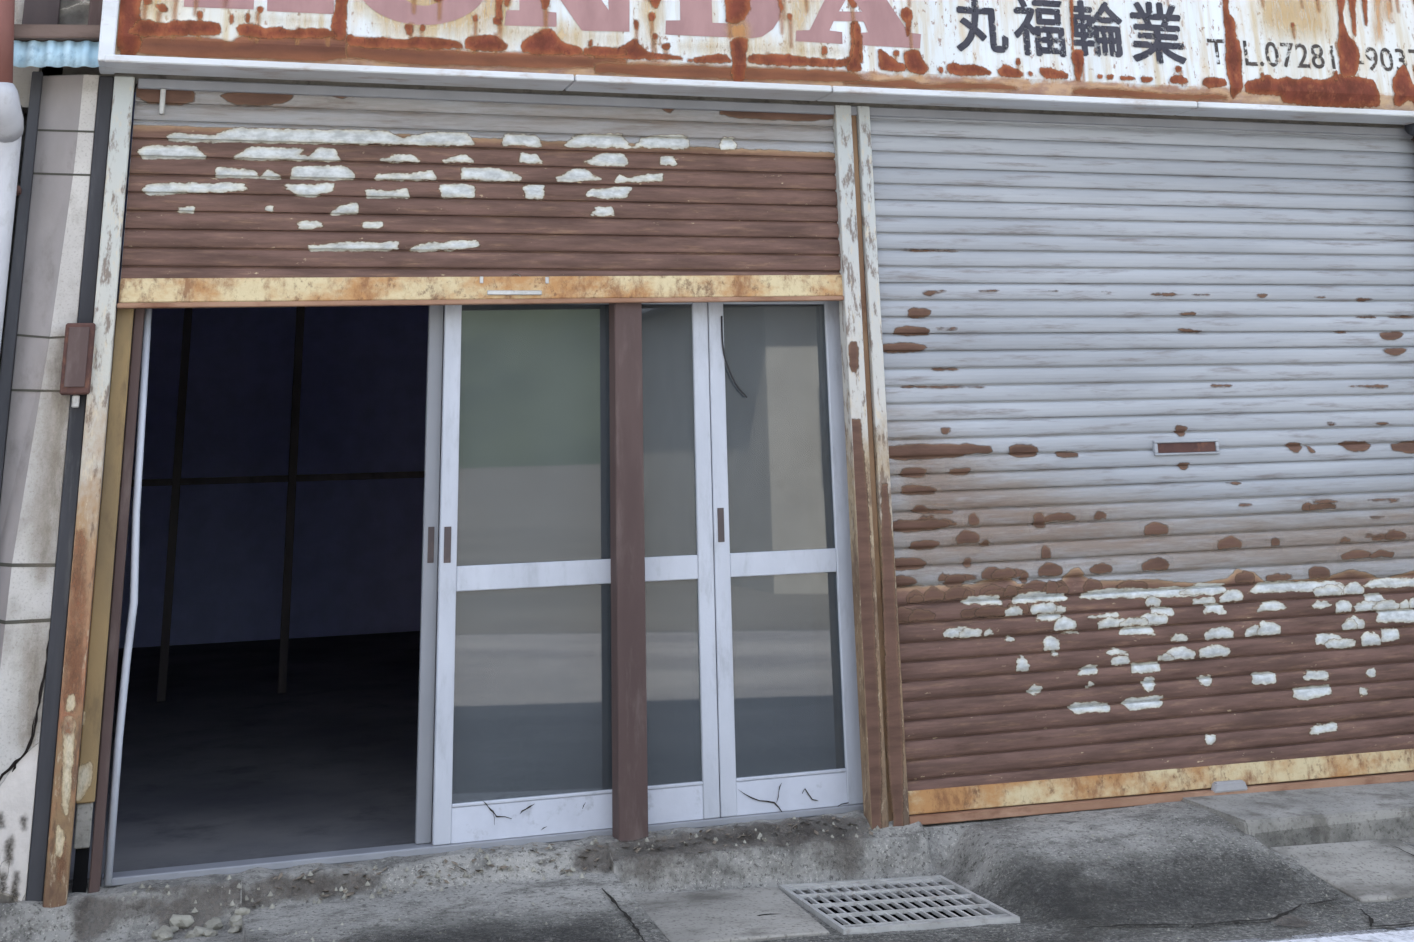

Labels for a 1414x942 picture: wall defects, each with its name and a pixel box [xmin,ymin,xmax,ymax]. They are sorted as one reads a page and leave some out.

corrosion [117,0,1414,109]
corrosion [719,111,833,121]
corrosion [121,122,841,278]
corrosion [848,341,859,372]
corrosion [902,368,983,389]
corrosion [1356,298,1414,355]
corrosion [62,530,86,734]
corrosion [852,419,1414,830]
crack [0,630,50,781]
crack [739,783,849,812]